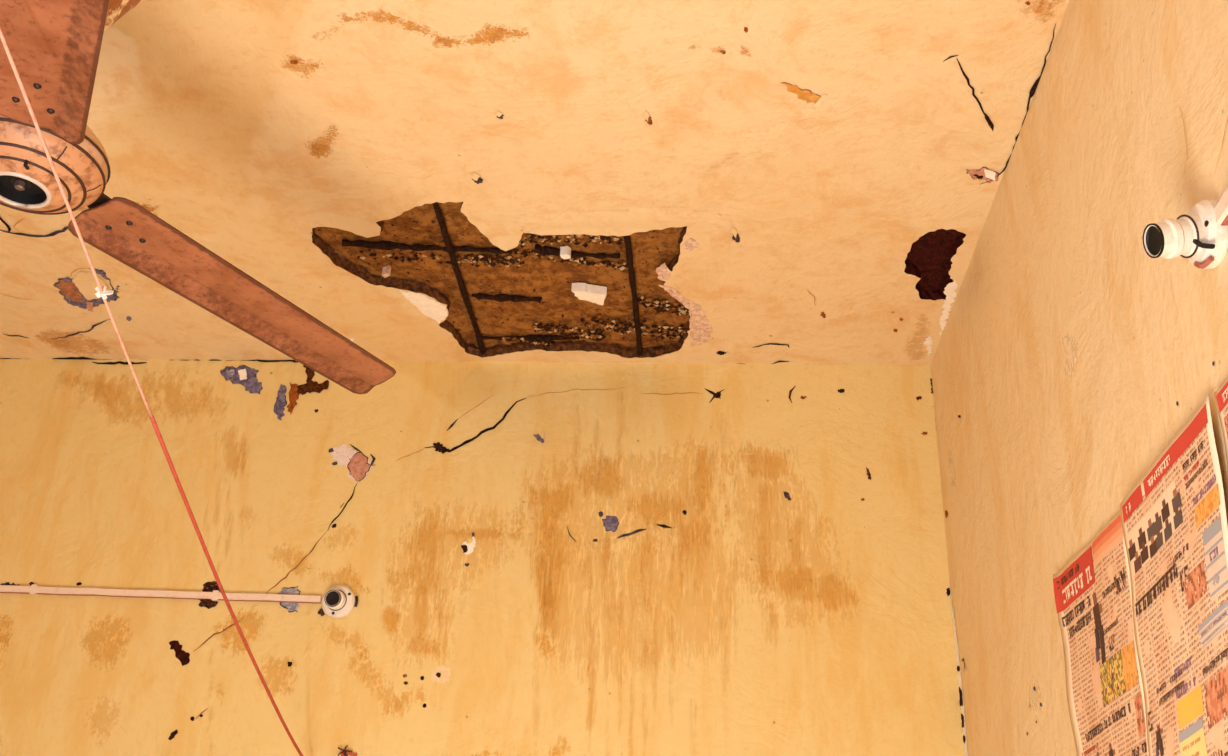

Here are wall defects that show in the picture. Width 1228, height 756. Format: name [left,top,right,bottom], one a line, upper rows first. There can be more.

crack [943,24,1056,185]
crack [0,217,68,237]
peeling [53,268,120,312]
spalling [312,202,713,358]
spalling [904,229,966,356]
crack [396,387,725,461]
peeling [328,444,376,483]